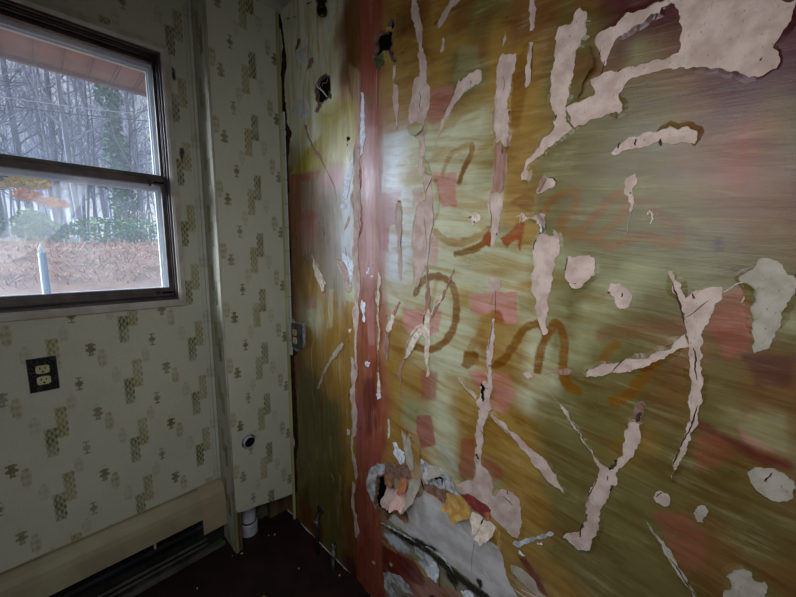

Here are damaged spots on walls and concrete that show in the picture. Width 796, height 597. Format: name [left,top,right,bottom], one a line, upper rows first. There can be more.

spalling [314,73,332,113]
peeling [317,92,445,539]
peeling [372,0,482,396]
flaking render [414,545,440,588]
peeling [469,32,533,246]
peeling [440,277,569,551]
peeling [517,209,600,335]
peeling [546,388,646,555]
peeling [520,0,796,194]
peeling [523,258,796,484]
peeling [720,563,768,597]
peeling [747,467,796,502]